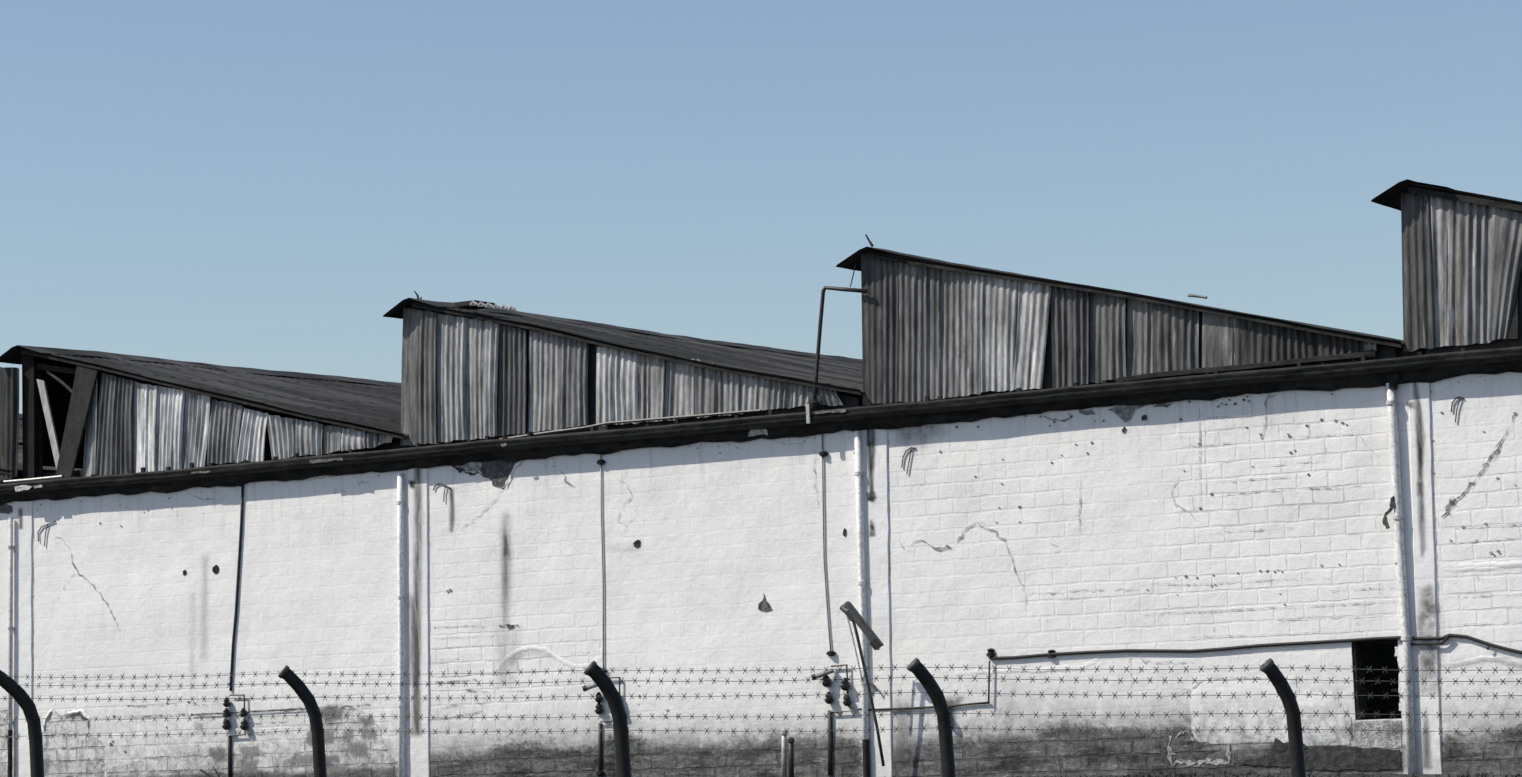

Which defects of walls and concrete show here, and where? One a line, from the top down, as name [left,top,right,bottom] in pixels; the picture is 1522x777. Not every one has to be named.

spalling [452,443,523,490]
crack [1050,479,1081,552]
crack [1442,414,1522,626]
crack [48,523,115,620]
crack [901,521,1395,637]
peeling [0,708,13,777]
spalling [1167,731,1401,771]